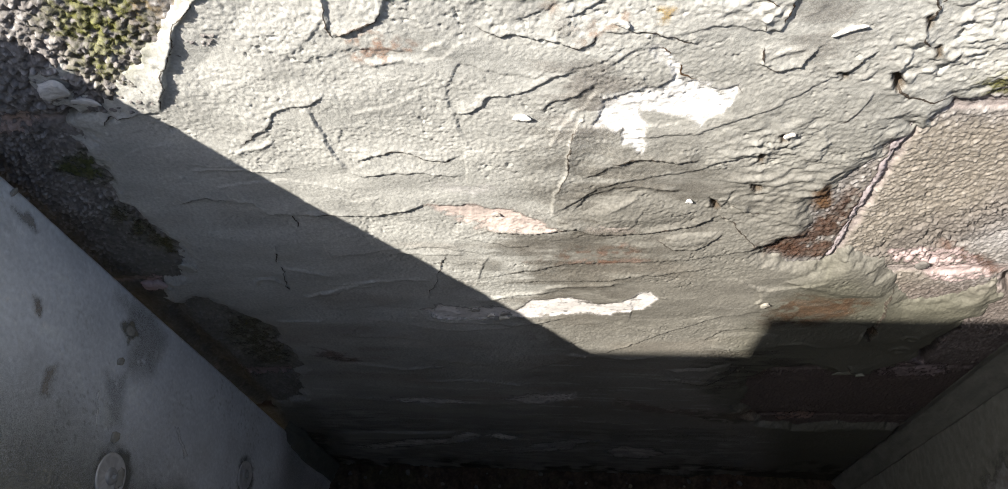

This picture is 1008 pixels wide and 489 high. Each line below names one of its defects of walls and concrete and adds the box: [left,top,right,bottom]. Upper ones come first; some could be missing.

crack [320,1,380,38]
crack [628,32,698,80]
crack [762,0,798,72]
crack [924,0,947,47]
peeling [37,80,102,107]
flaking render [591,45,738,153]
spalling [892,72,905,91]
crack [896,80,963,104]
flaking render [427,184,562,234]
rust [760,185,862,258]
peeling [888,246,991,282]
flaking render [425,292,658,320]